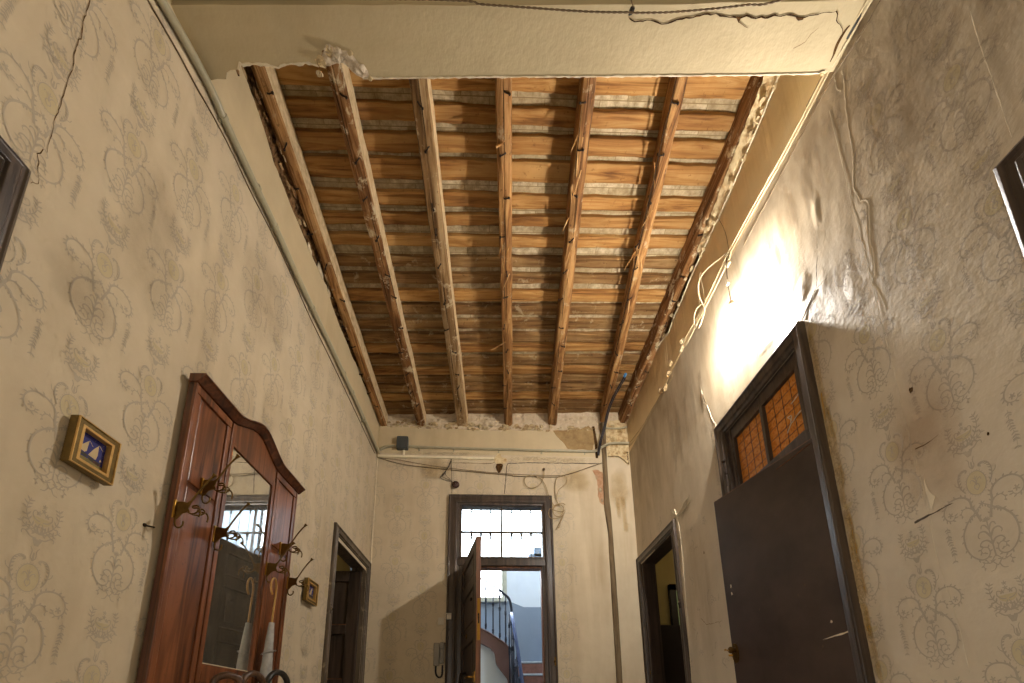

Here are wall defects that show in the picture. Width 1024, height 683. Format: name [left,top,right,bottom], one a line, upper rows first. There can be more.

crack [31,0,90,184]
crack [629,11,843,49]
flaking render [236,44,819,391]
flaking render [379,412,630,465]